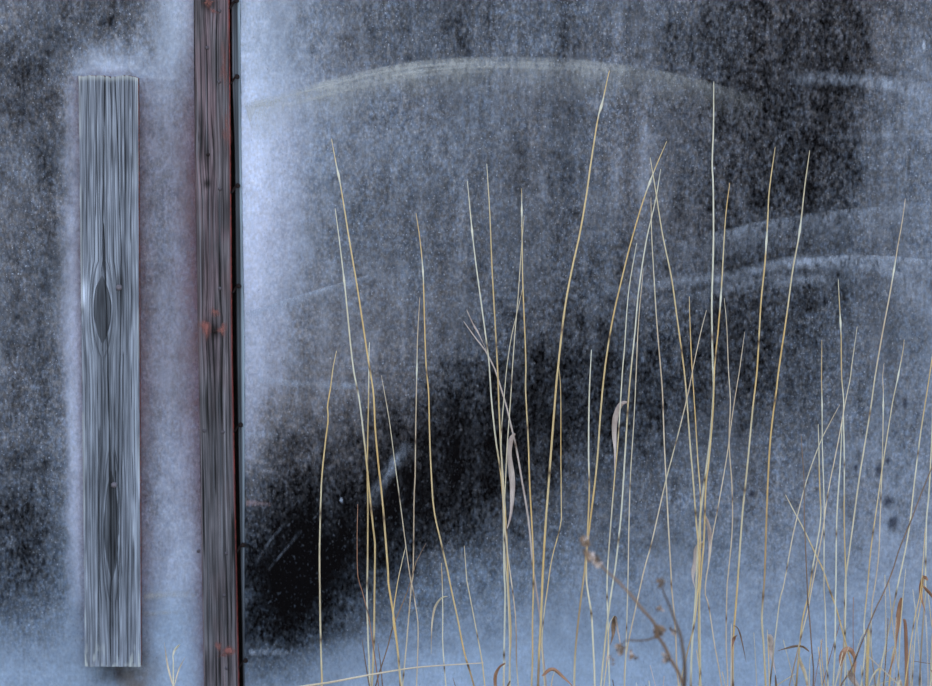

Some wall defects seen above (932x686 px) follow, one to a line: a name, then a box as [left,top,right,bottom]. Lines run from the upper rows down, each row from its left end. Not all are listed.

water stain [0,461,48,586]
water stain [245,0,873,651]